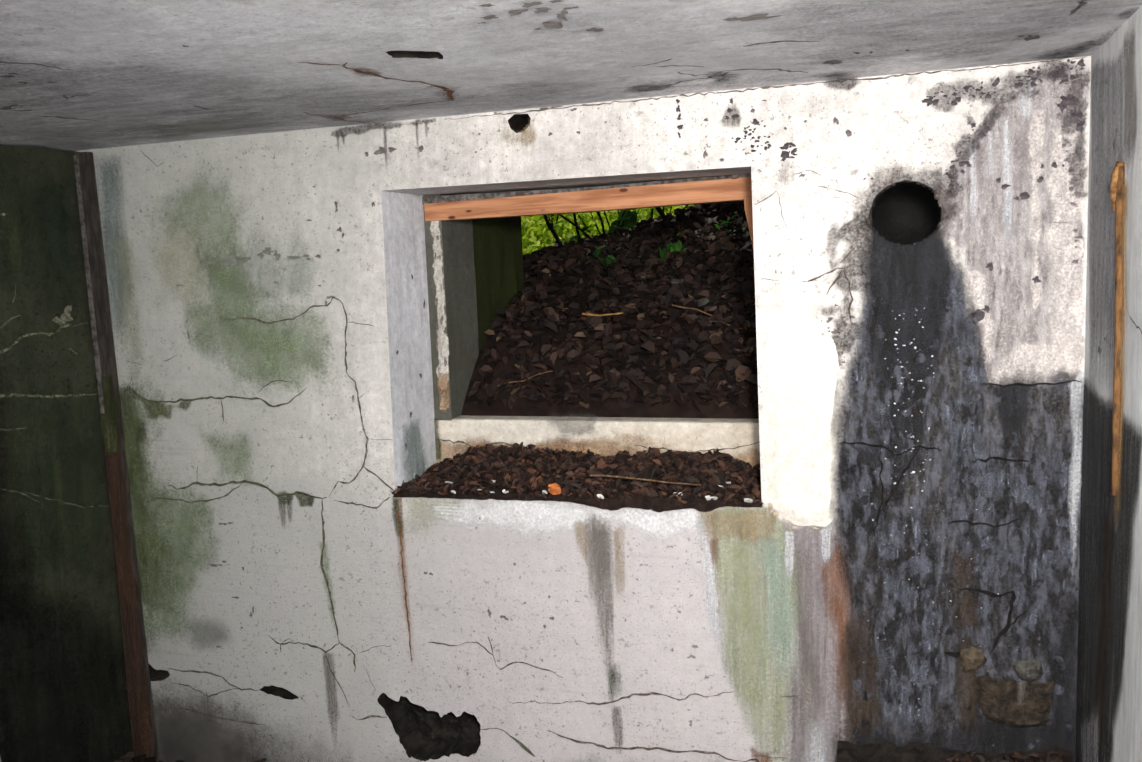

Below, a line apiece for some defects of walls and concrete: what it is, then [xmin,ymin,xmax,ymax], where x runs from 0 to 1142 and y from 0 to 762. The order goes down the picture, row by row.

crack [0,61,91,120]
spalling [386,50,443,61]
leakage [927,29,1136,360]
rust [1118,184,1127,463]
crack [146,297,787,762]
leakage [533,425,648,457]
leakage [577,516,621,694]
leakage [700,227,1142,762]
spalling [377,693,481,761]
leakage [613,708,622,746]